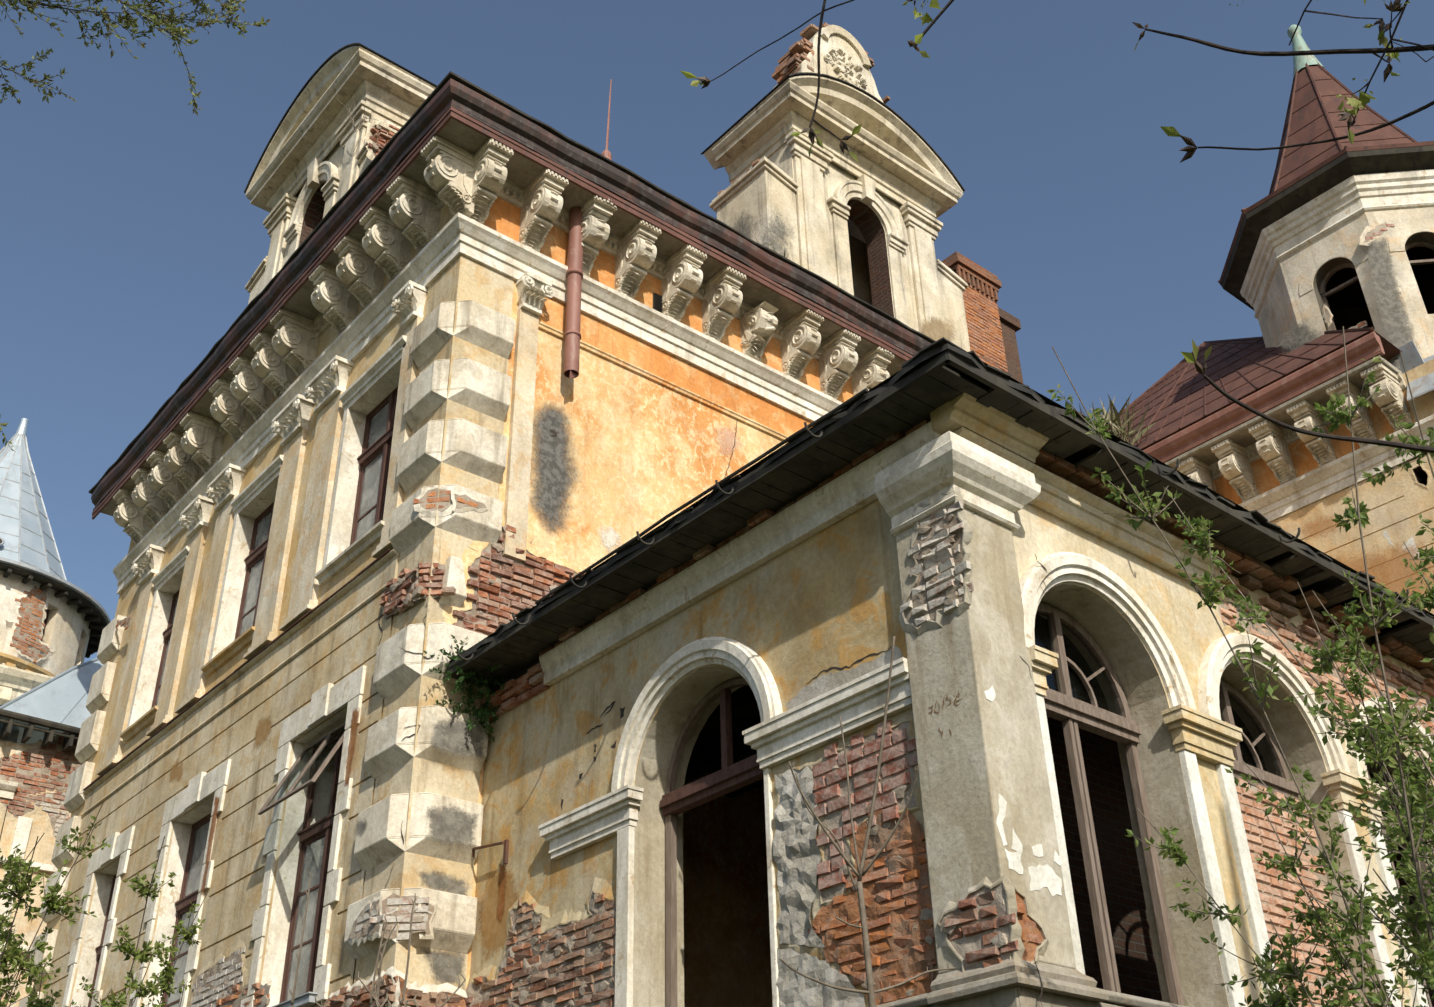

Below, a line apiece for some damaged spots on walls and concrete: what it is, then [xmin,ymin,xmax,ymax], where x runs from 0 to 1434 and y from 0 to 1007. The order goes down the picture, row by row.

damp [532,407,575,532]
spalling [0,583,56,663]
spalling [379,485,585,636]
spalling [786,487,974,710]
peeling [984,685,996,702]
spalling [1211,591,1434,785]
spalling [0,732,82,846]
spalling [324,877,616,1007]
spalling [772,715,1063,1007]
flaking render [1235,778,1357,1007]